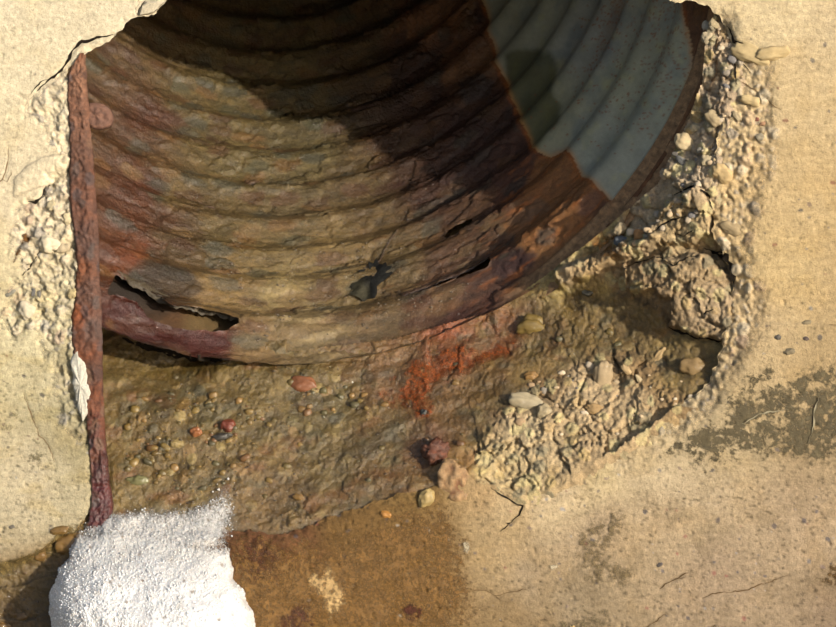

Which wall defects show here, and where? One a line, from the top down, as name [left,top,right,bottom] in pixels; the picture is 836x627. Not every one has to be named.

spalling [135,0,167,16]
crack [31,34,113,94]
spalling [25,71,70,155]
rust [86,0,719,365]
crack [674,185,714,212]
crack [625,248,736,284]
spalling [661,42,790,433]
spalling [0,173,88,447]
crack [669,327,721,343]
rust [378,341,515,418]
water stain [666,365,836,465]
water stain [308,569,344,618]